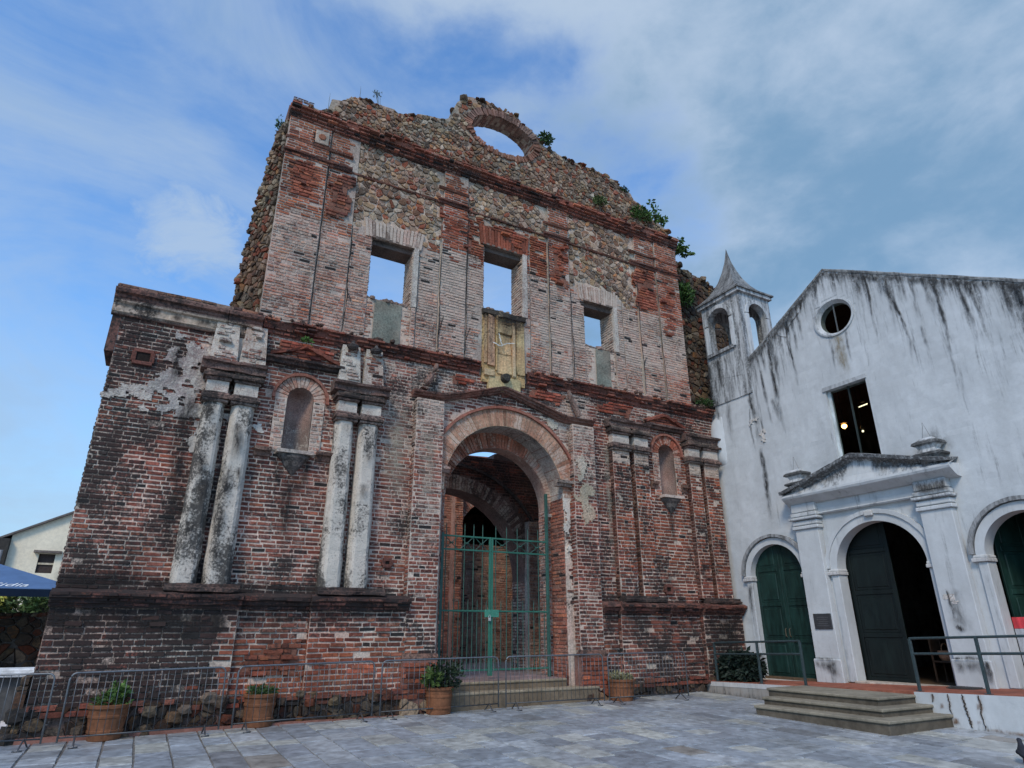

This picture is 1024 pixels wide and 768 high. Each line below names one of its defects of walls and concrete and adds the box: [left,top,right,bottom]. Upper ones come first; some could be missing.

water stain [752,273,837,397]
water stain [856,275,988,332]
flaking render [100,331,213,453]
water stain [169,401,194,511]
flaking render [539,416,558,430]
flaking render [561,450,596,552]
water stain [916,480,946,492]